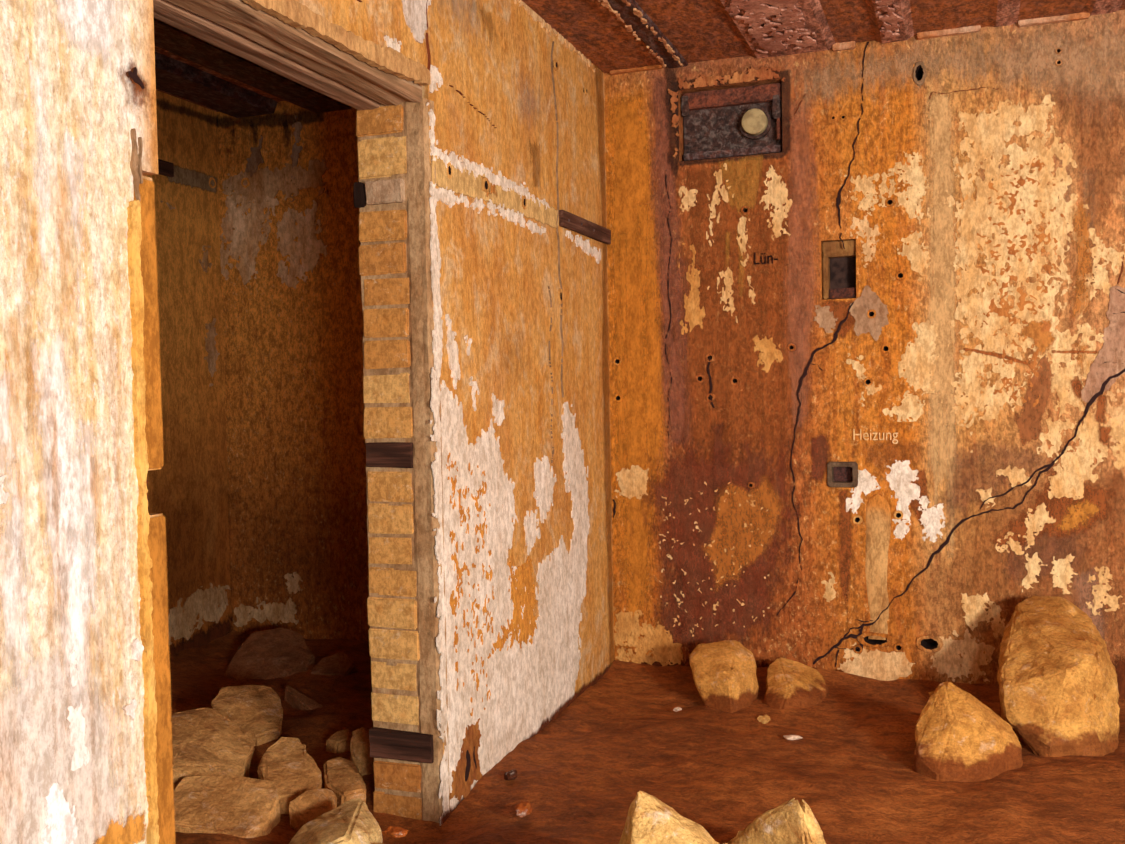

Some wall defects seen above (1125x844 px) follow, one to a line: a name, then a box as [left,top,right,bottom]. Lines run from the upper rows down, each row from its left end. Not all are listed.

peeling [168,572,303,645]
peeling [243,0,601,826]
peeling [613,482,770,666]
peeling [678,163,734,246]
peeling [678,216,756,335]
peeling [759,165,792,241]
crack [777,302,854,616]
crack [836,42,869,249]
peeling [930,592,1005,684]
crack [813,362,1125,667]
peeling [844,94,1125,615]
crack [1113,255,1125,314]